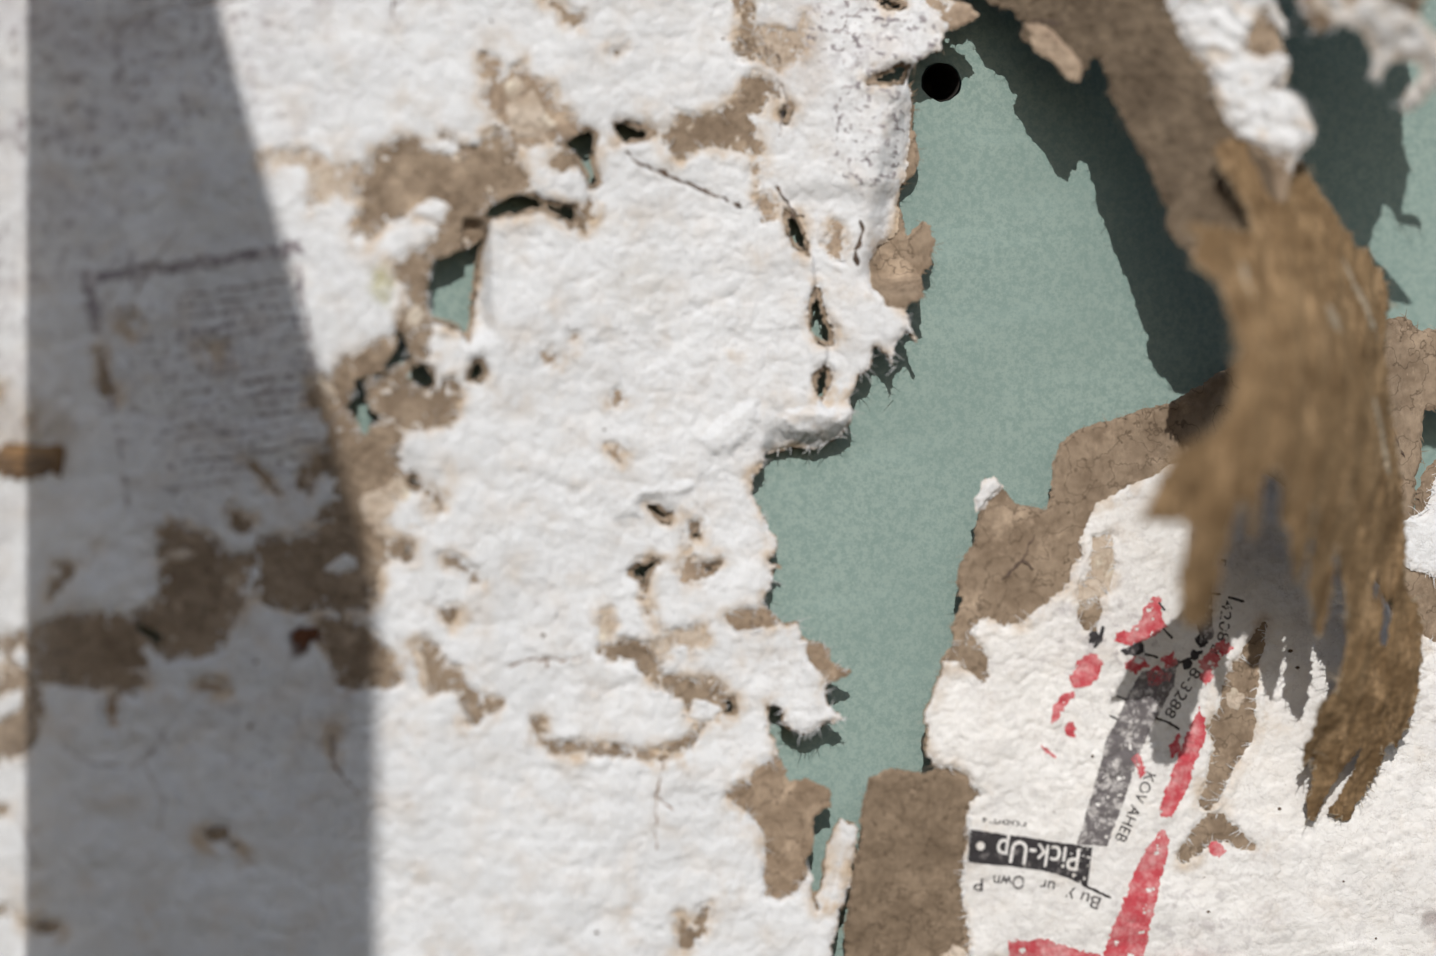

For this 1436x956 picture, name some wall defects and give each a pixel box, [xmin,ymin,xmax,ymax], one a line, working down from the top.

peeling [550,1,587,29]
peeling [651,0,808,223]
peeling [926,0,1277,247]
peeling [569,188,595,235]
peeling [826,222,844,260]
peeling [870,221,936,309]
peeling [0,52,585,760]
peeling [612,389,623,406]
peeling [1077,533,1116,631]
peeling [949,630,989,684]
peeling [1177,622,1268,864]
peeling [726,749,832,899]